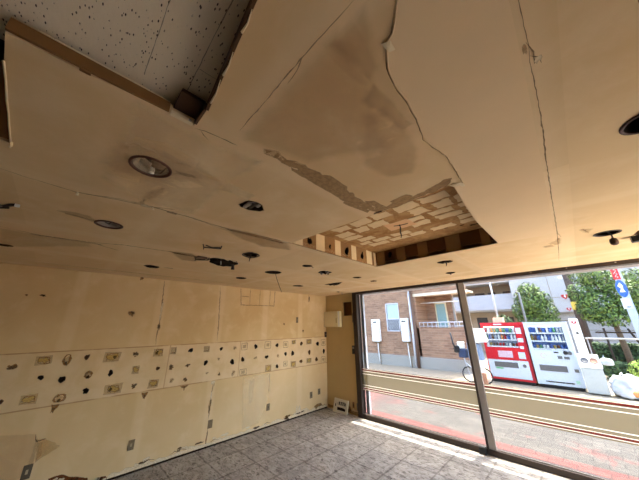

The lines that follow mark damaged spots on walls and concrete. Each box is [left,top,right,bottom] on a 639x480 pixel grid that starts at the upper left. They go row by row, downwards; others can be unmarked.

crack [242,1,353,128]
crack [518,0,559,255]